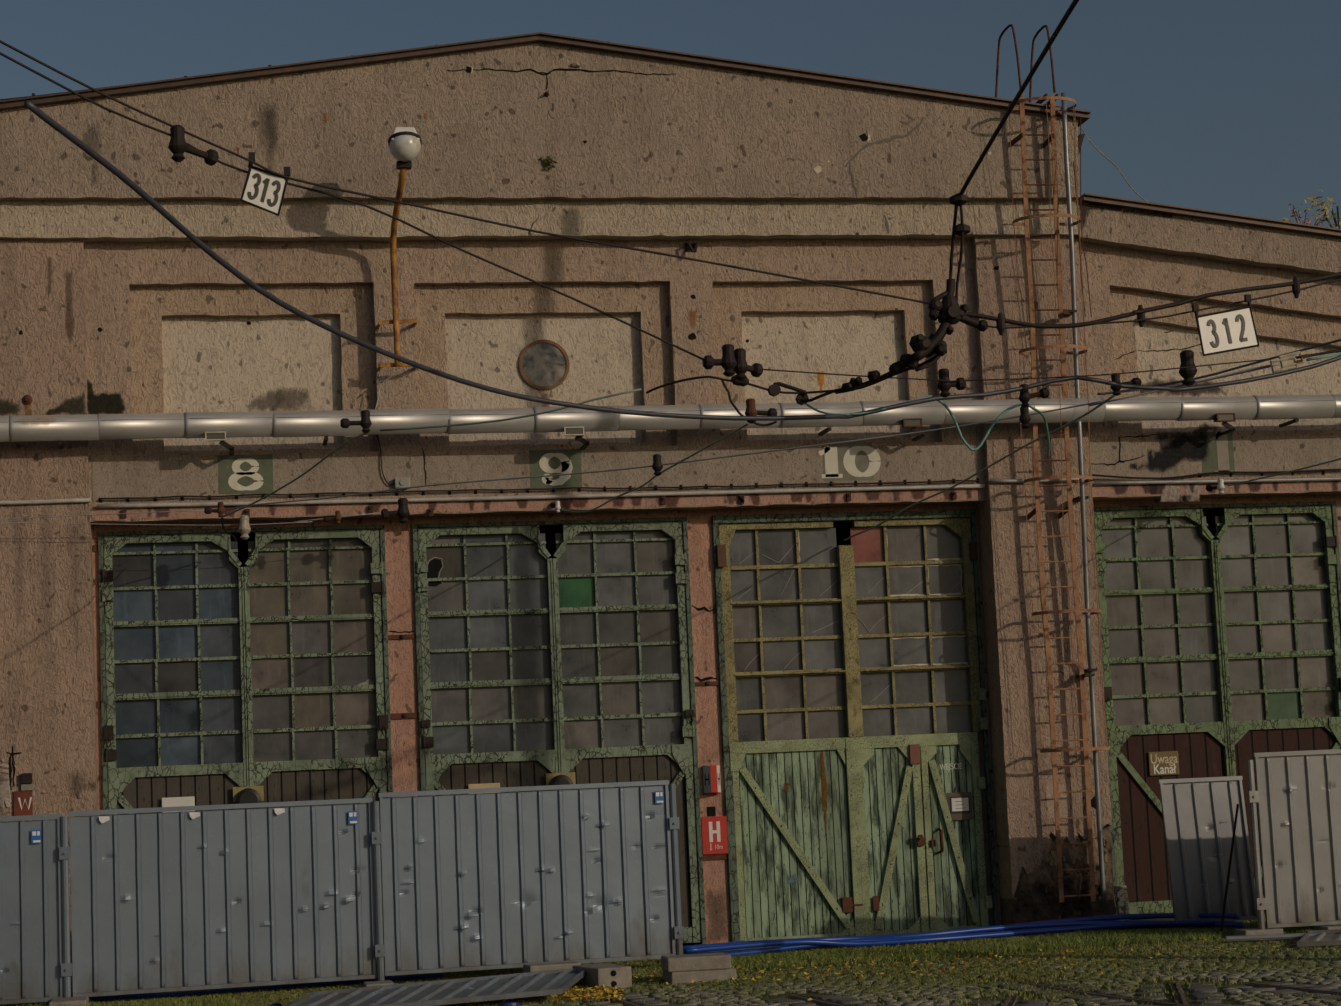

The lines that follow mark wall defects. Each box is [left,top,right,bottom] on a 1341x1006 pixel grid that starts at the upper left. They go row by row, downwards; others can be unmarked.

crack [447,68,673,90]
crack [846,114,924,233]
spalling [1012,824,1116,924]